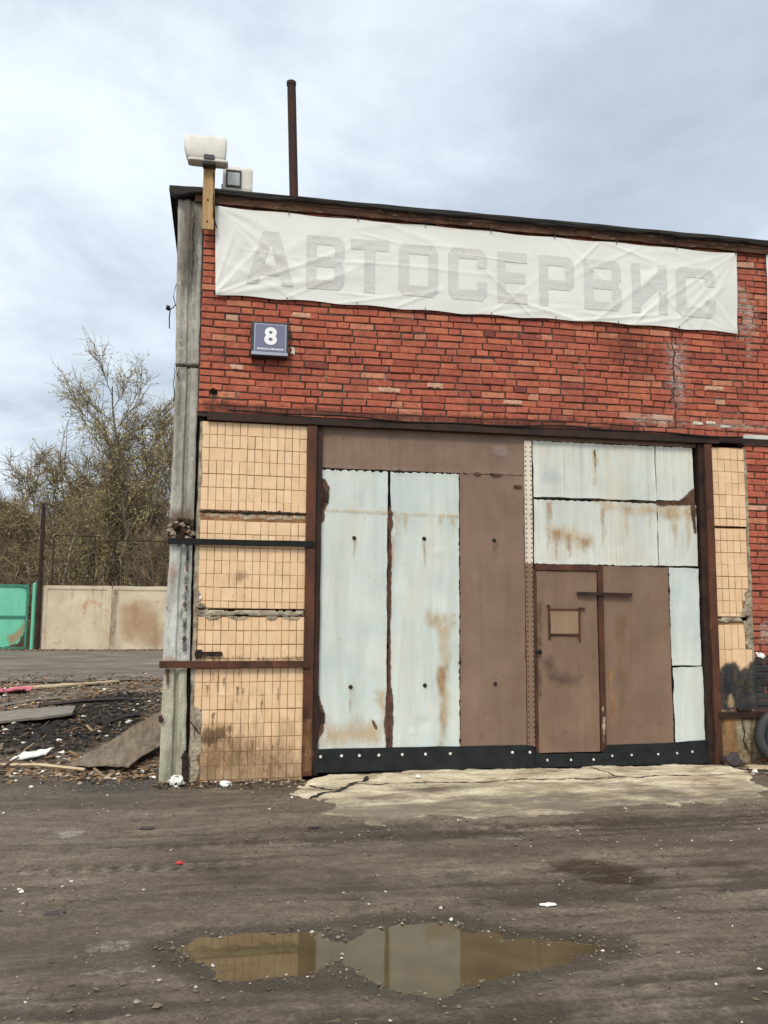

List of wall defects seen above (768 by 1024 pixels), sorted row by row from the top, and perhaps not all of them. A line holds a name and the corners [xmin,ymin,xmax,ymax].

crack [668,331,682,429]
corrosion [640,489,697,533]
spalling [180,546,304,652]
corrosion [328,505,406,747]
crack [308,775,387,799]